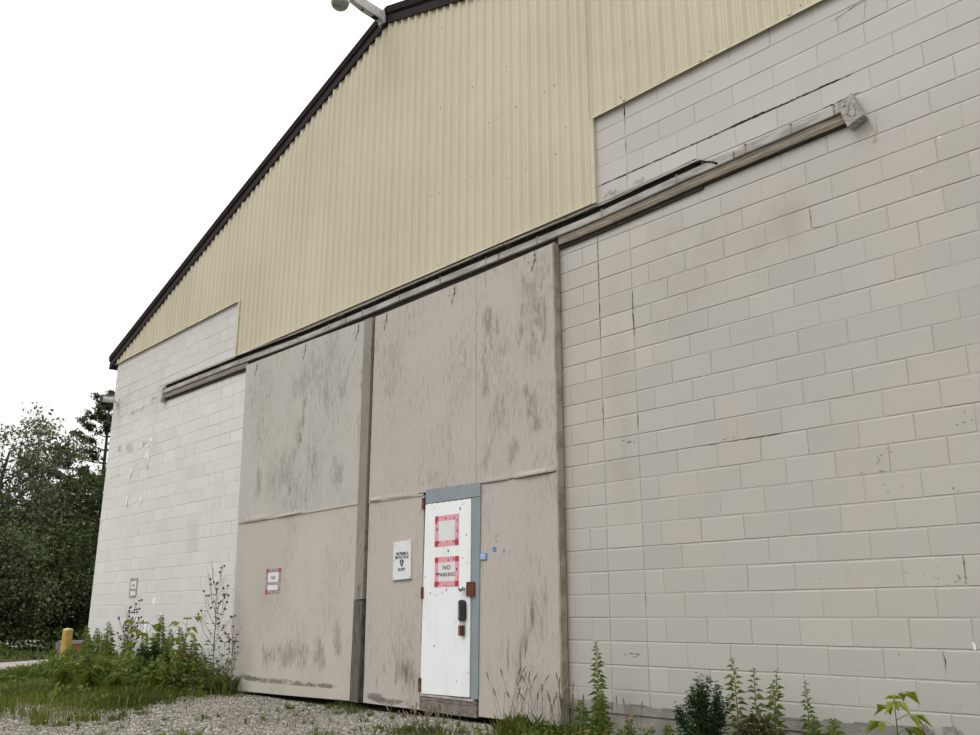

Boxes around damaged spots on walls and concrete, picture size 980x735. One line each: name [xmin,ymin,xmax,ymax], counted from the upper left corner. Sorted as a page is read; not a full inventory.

crack [599,73,859,186]